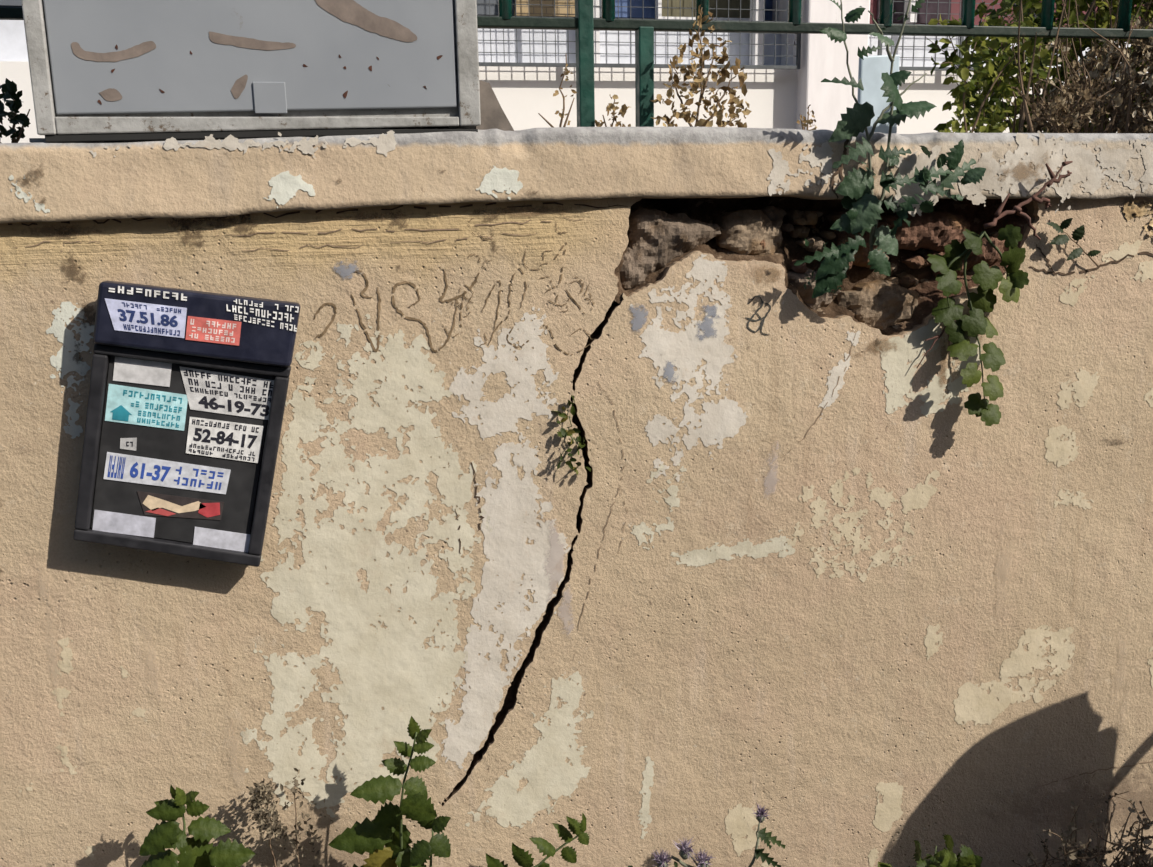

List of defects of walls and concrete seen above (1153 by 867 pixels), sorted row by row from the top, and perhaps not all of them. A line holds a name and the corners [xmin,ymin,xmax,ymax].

peeling [151,132,328,159]
peeling [264,171,315,208]
peeling [343,130,397,157]
crack [1029,236,1153,275]
peeling [46,302,95,439]
peeling [614,131,1153,550]
peeling [240,307,570,818]
crack [437,294,628,814]
peeling [670,467,940,583]
peeling [953,625,1075,726]
peeling [465,671,594,834]